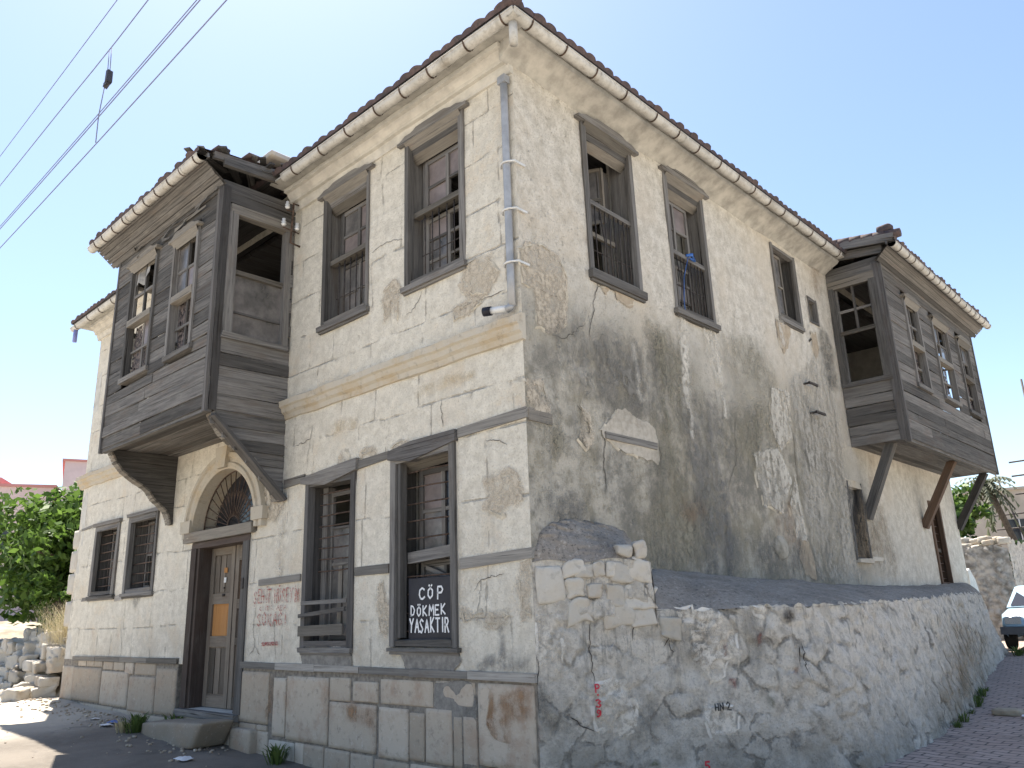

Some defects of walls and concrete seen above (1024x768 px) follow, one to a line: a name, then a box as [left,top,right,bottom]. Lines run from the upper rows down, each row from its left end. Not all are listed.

spalling [452,256,500,322]
spalling [517,241,569,334]
crack [554,283,601,339]
spalling [577,405,660,465]
leakage [577,317,731,571]
spalling [752,387,806,540]
crack [587,625,595,684]